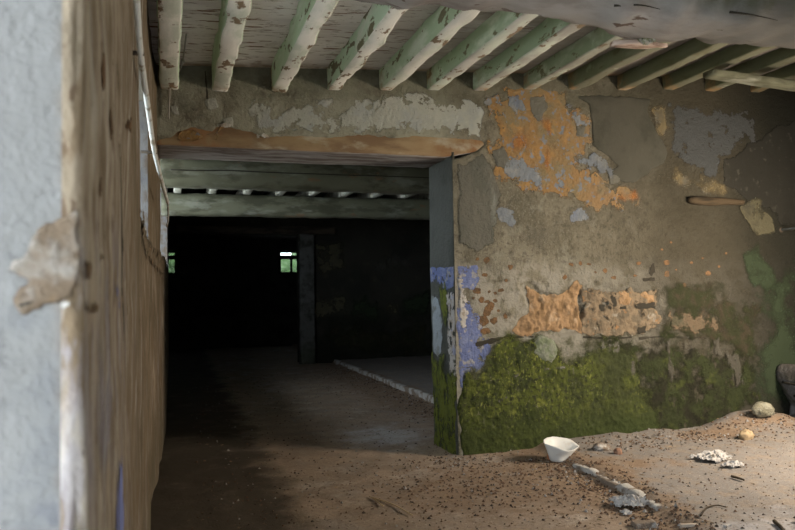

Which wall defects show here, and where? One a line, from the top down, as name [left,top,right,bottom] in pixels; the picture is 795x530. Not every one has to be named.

peeling [249,87,640,222]
peeling [651,102,756,196]
spalling [9,211,104,315]
peeling [430,257,513,388]
spalling [512,275,718,363]
damp [714,339,743,385]